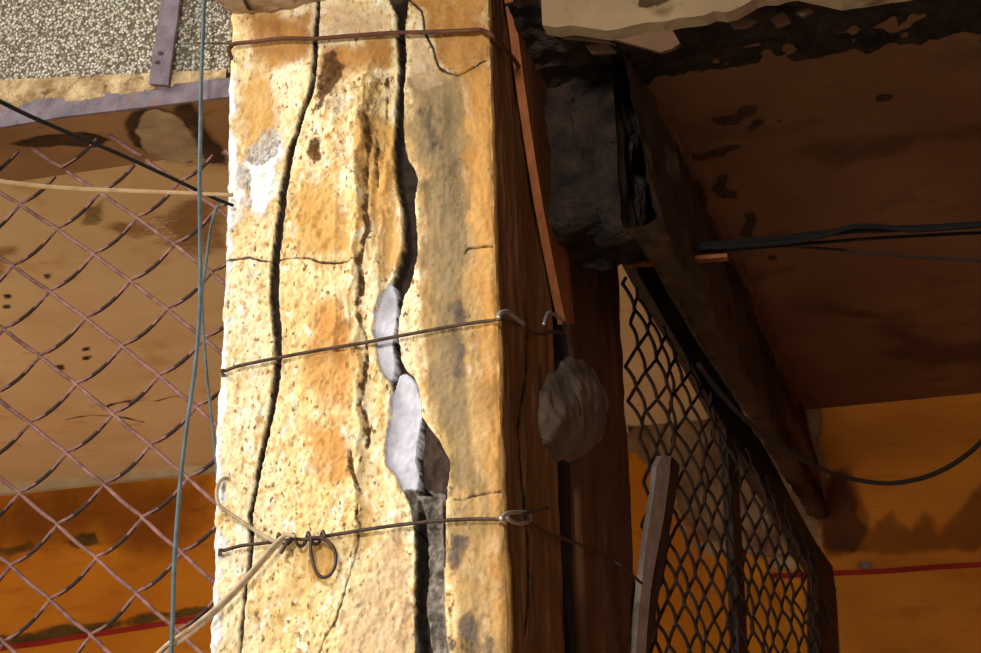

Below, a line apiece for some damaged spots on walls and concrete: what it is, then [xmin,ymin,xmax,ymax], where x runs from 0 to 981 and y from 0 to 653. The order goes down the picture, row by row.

peeling [638,0,667,8]
crack [392,0,486,392]
crack [227,0,353,652]
crack [418,402,431,497]
damp [819,473,981,556]
crack [319,534,359,653]